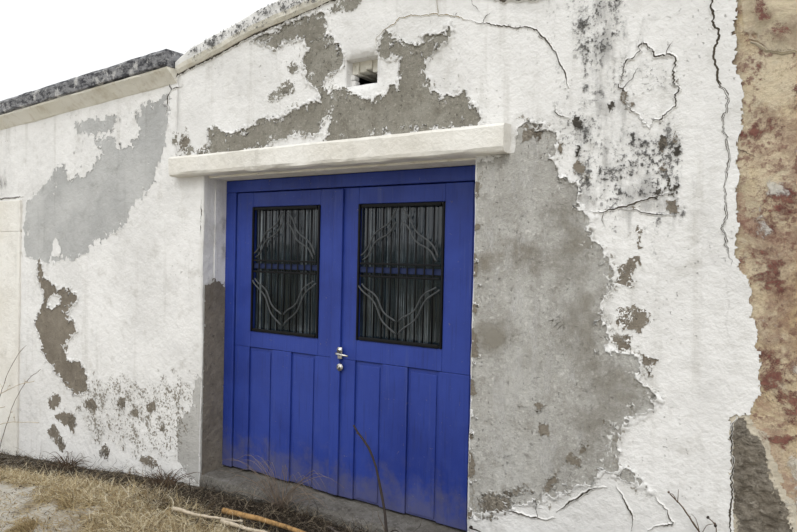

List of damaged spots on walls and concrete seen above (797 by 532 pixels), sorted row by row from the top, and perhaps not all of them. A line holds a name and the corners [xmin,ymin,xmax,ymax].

crack [166,0,338,116]
flaking render [171,0,491,156]
crack [375,0,570,89]
damp [573,0,621,101]
crack [617,41,683,130]
damp [560,111,682,233]
flaking render [650,129,683,214]
crack [707,0,759,345]
flaking render [34,257,97,453]
flaking render [467,115,667,522]
crack [473,485,675,532]
spalling [728,414,797,532]